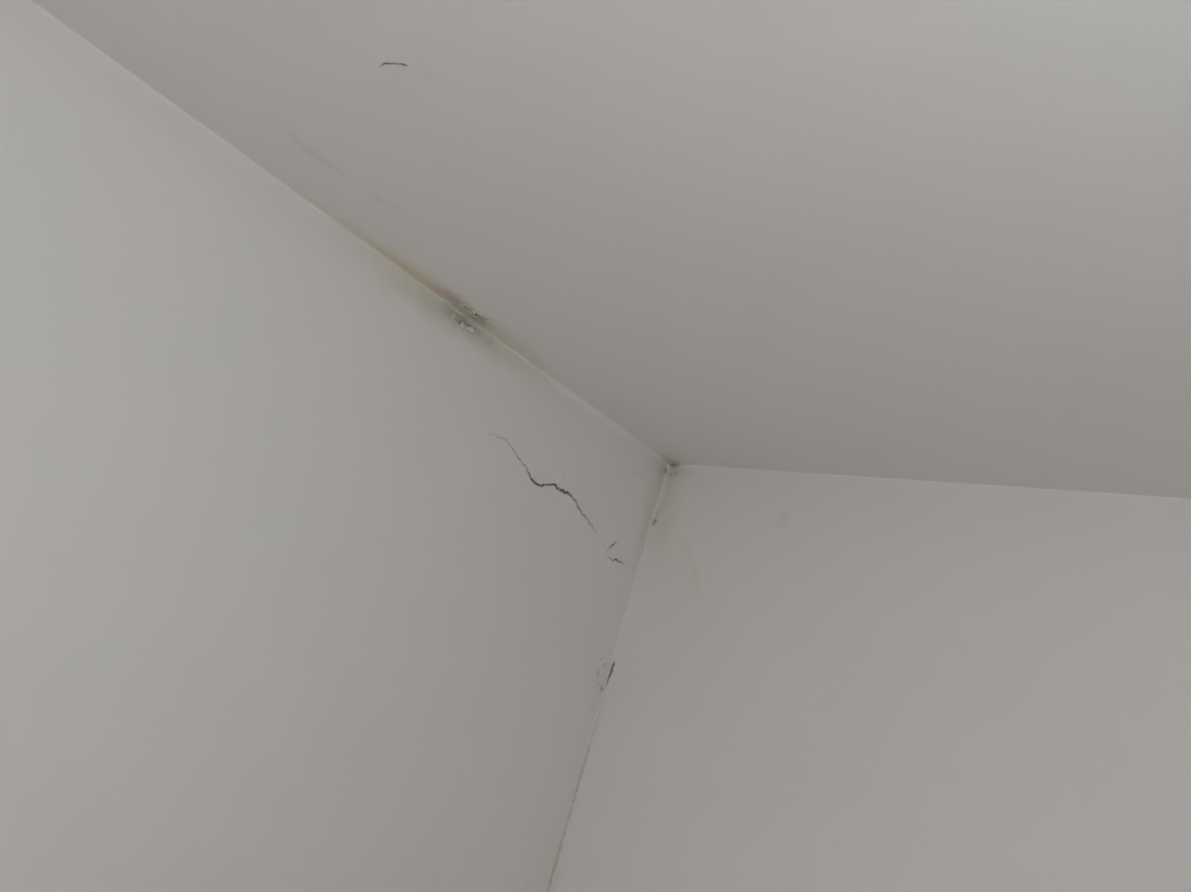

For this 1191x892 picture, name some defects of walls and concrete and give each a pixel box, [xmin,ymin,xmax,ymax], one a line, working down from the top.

crack [528,472,579,509]